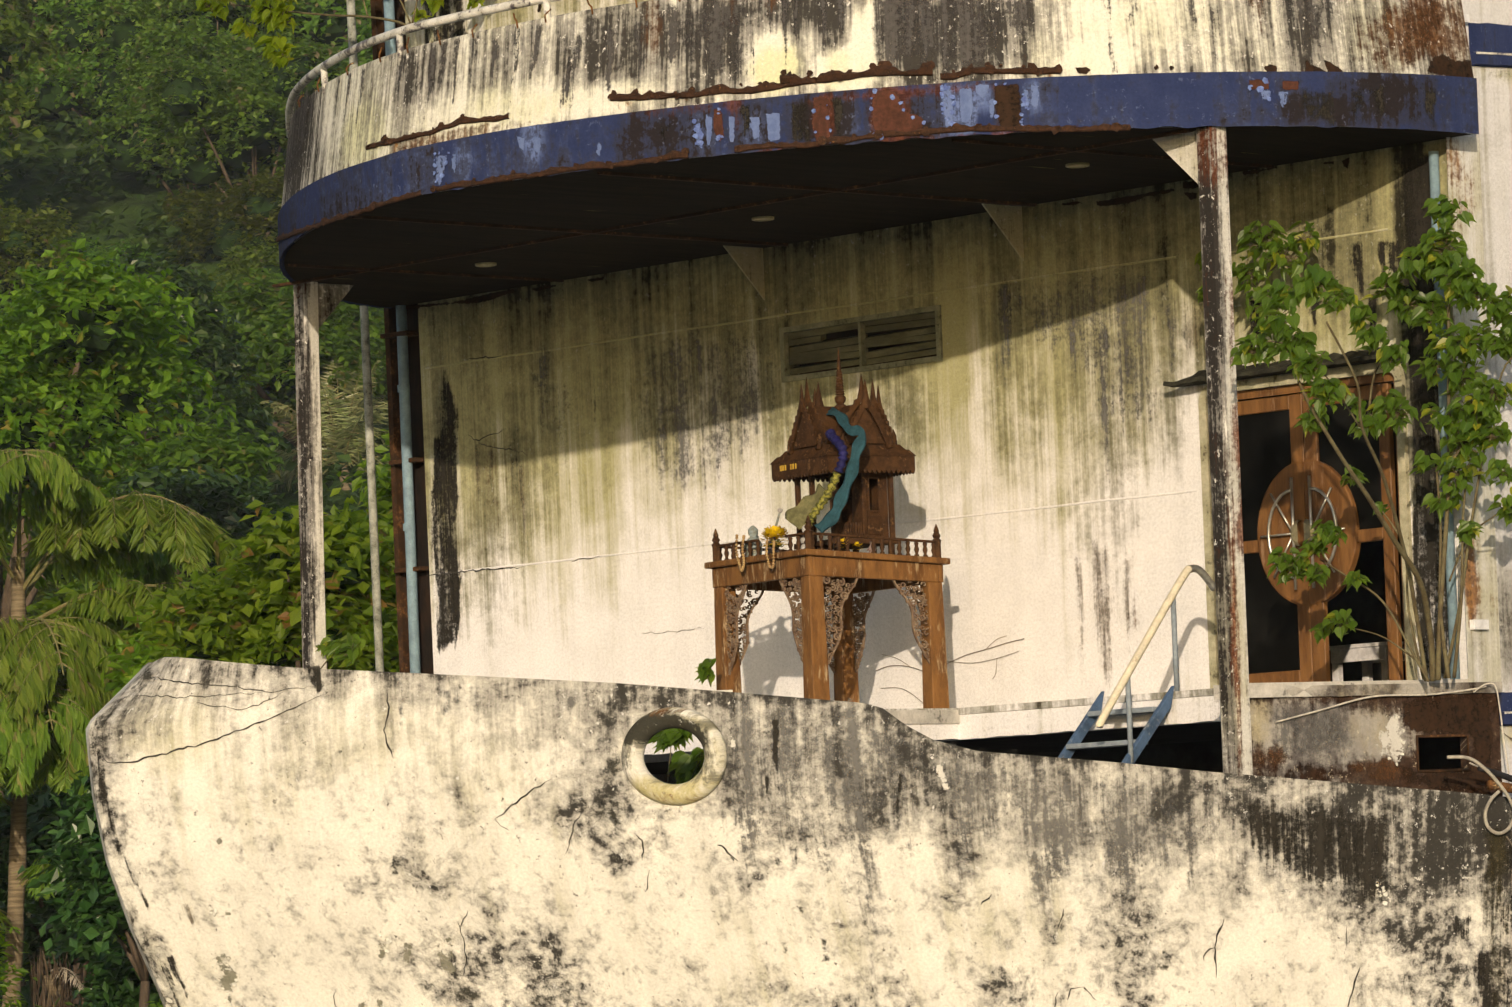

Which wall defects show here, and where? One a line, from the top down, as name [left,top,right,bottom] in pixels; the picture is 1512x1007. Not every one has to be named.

damp [424,0,544,117]
peeling [692,108,781,148]
peeling [811,96,832,142]
rust [607,60,1090,106]
peeling [869,83,1039,140]
rust [1383,0,1474,78]
damp [1349,155,1449,677]
damp [430,371,462,652]
crack [102,676,324,763]
rust [1252,744,1289,768]
rust [1348,694,1494,794]
damp [1239,796,1393,907]